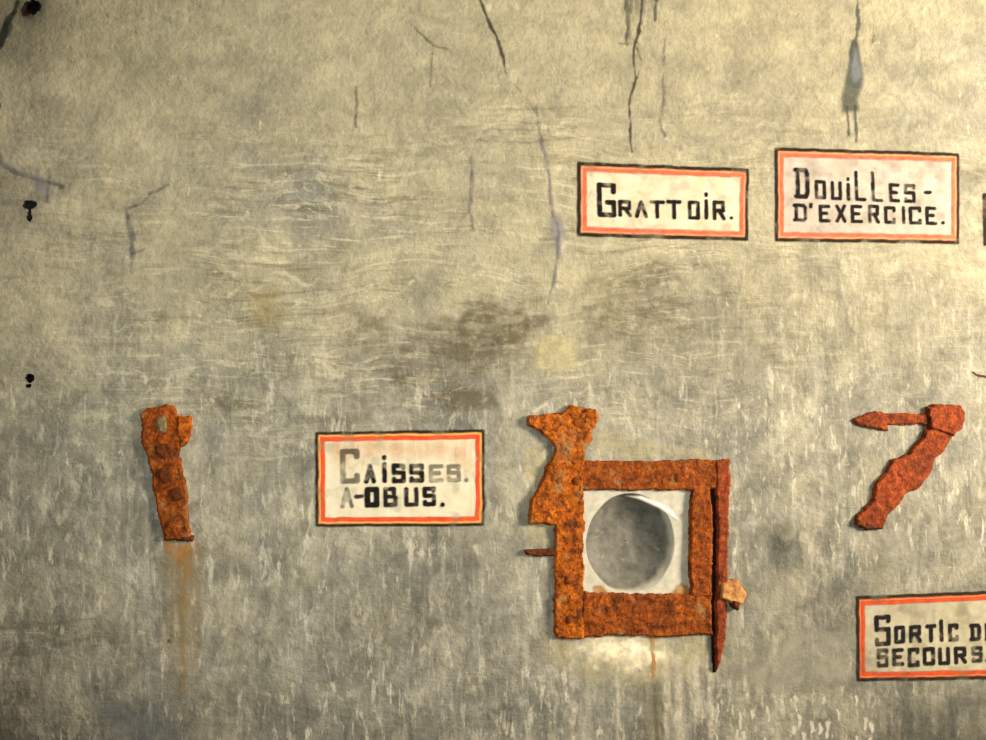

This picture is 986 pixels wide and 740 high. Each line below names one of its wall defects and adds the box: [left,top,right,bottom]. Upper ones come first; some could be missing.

crack [0,0,20,49]
crack [480,0,506,72]
crack [629,0,643,152]
damp [843,5,862,142]
crack [7,167,63,199]
crack [549,174,566,284]